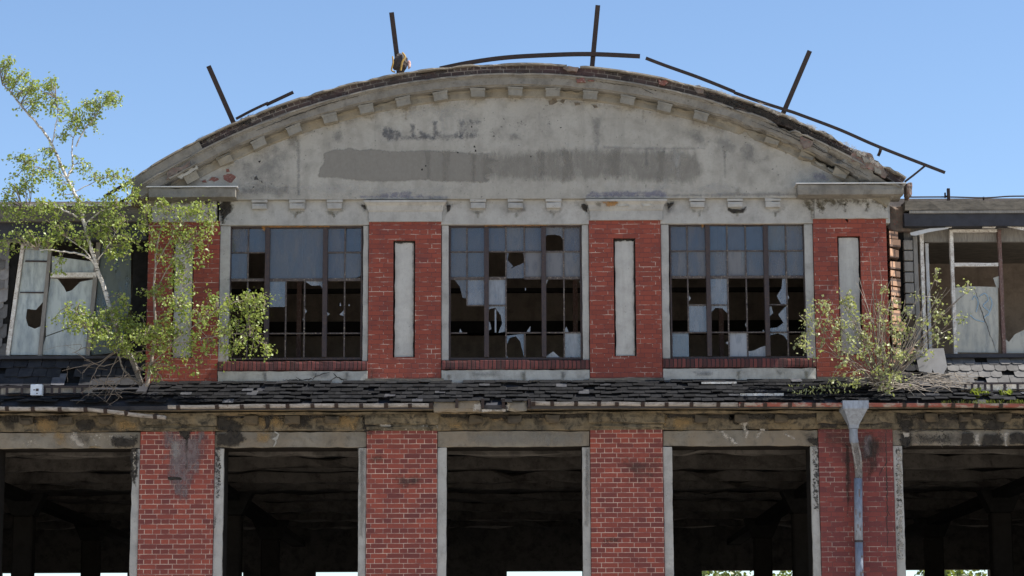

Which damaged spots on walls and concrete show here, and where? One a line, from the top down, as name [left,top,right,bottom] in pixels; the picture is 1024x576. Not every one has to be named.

spalling [166,161,238,184]
spalling [850,150,888,180]
leakage [23,420,84,446]
leakage [111,421,138,448]
leakage [663,418,765,444]
leakage [897,418,936,447]
leakage [960,421,1024,447]
leakage [164,417,282,497]